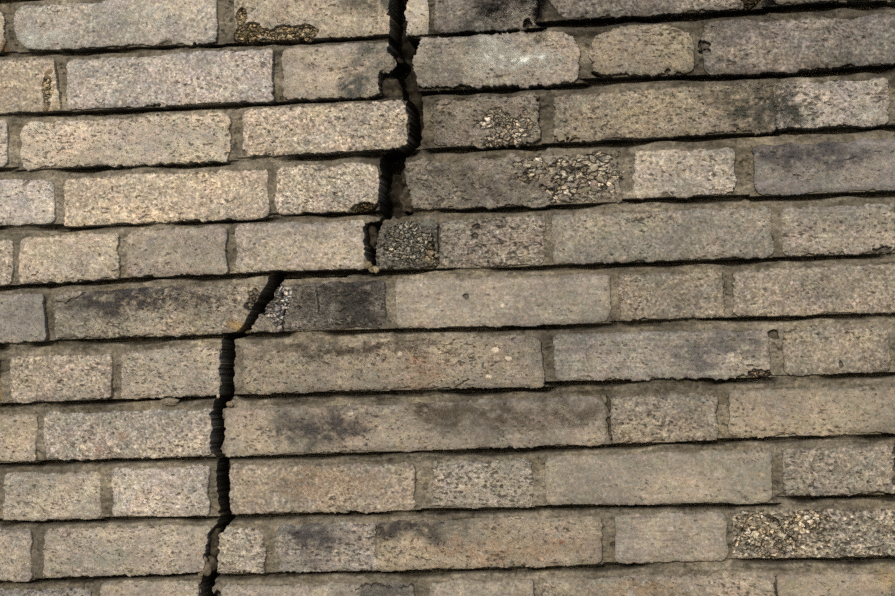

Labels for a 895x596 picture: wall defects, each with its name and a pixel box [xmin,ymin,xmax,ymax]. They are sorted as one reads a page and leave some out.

crack [198,0,424,596]